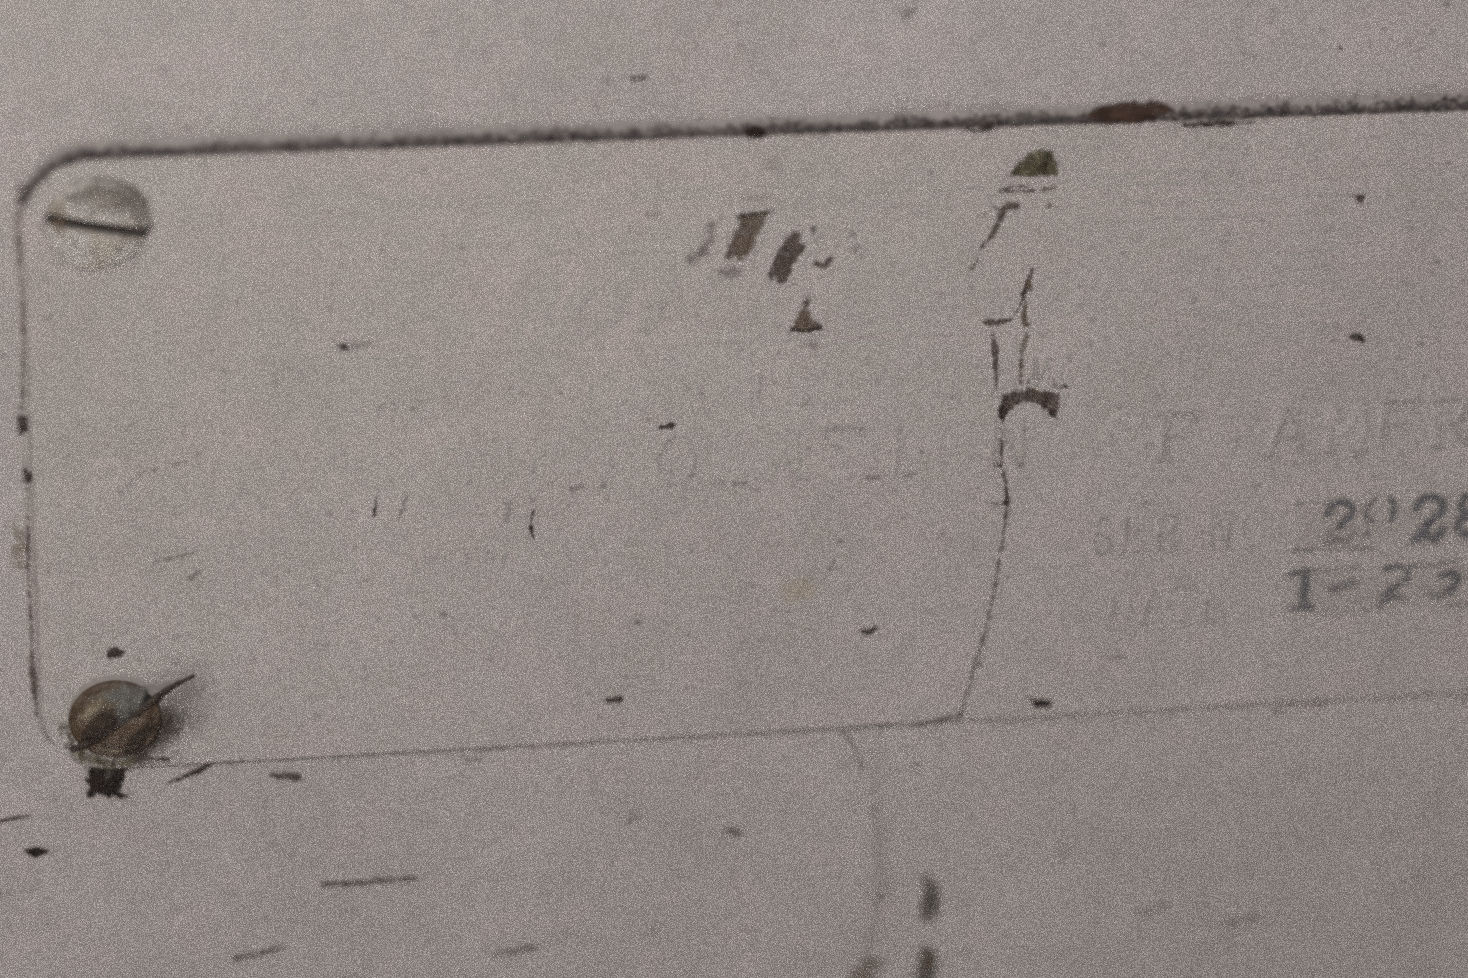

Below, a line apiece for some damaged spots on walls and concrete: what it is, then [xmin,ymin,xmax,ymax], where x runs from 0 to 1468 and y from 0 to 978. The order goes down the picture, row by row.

peeling [721,206,832,338]
peeling [970,145,1064,270]
crack [853,334,1029,730]
corrosion [60,709,179,770]